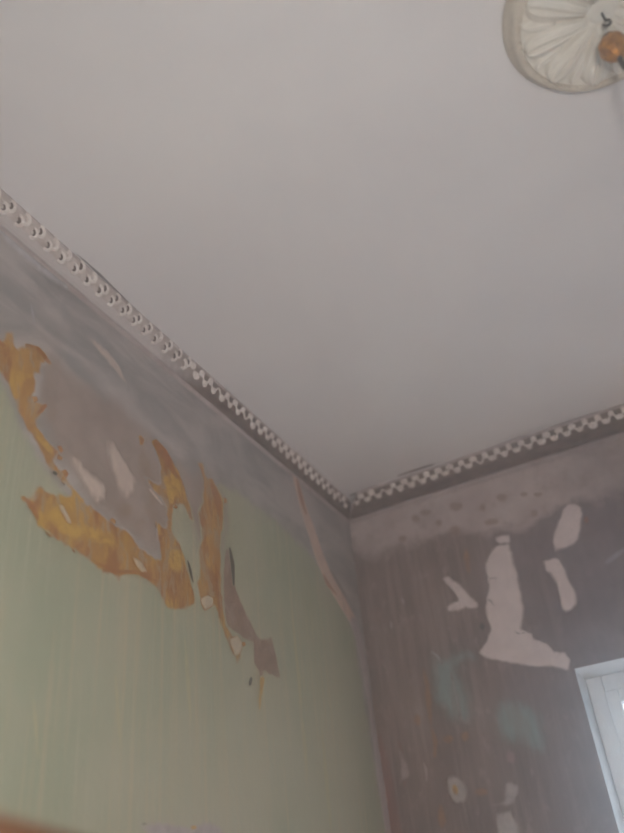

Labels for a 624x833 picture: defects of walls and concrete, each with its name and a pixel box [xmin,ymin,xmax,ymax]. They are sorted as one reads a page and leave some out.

peeling [0,326,281,711]